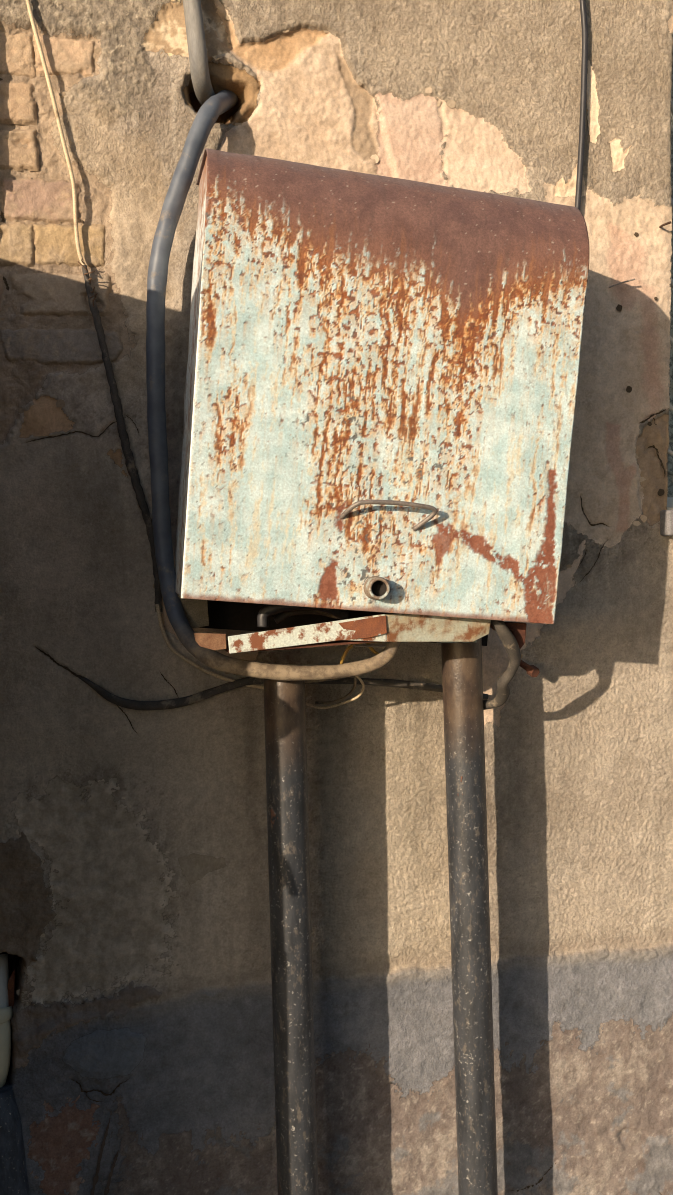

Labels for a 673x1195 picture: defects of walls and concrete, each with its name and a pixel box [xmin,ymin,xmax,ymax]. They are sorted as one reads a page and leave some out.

flaking render [141,0,189,57]
flaking render [183,79,201,112]
flaking render [0,20,137,445]
flaking render [192,0,672,728]
flaking render [0,764,179,1069]
peeling [315,1044,459,1195]
crack [510,1163,556,1192]